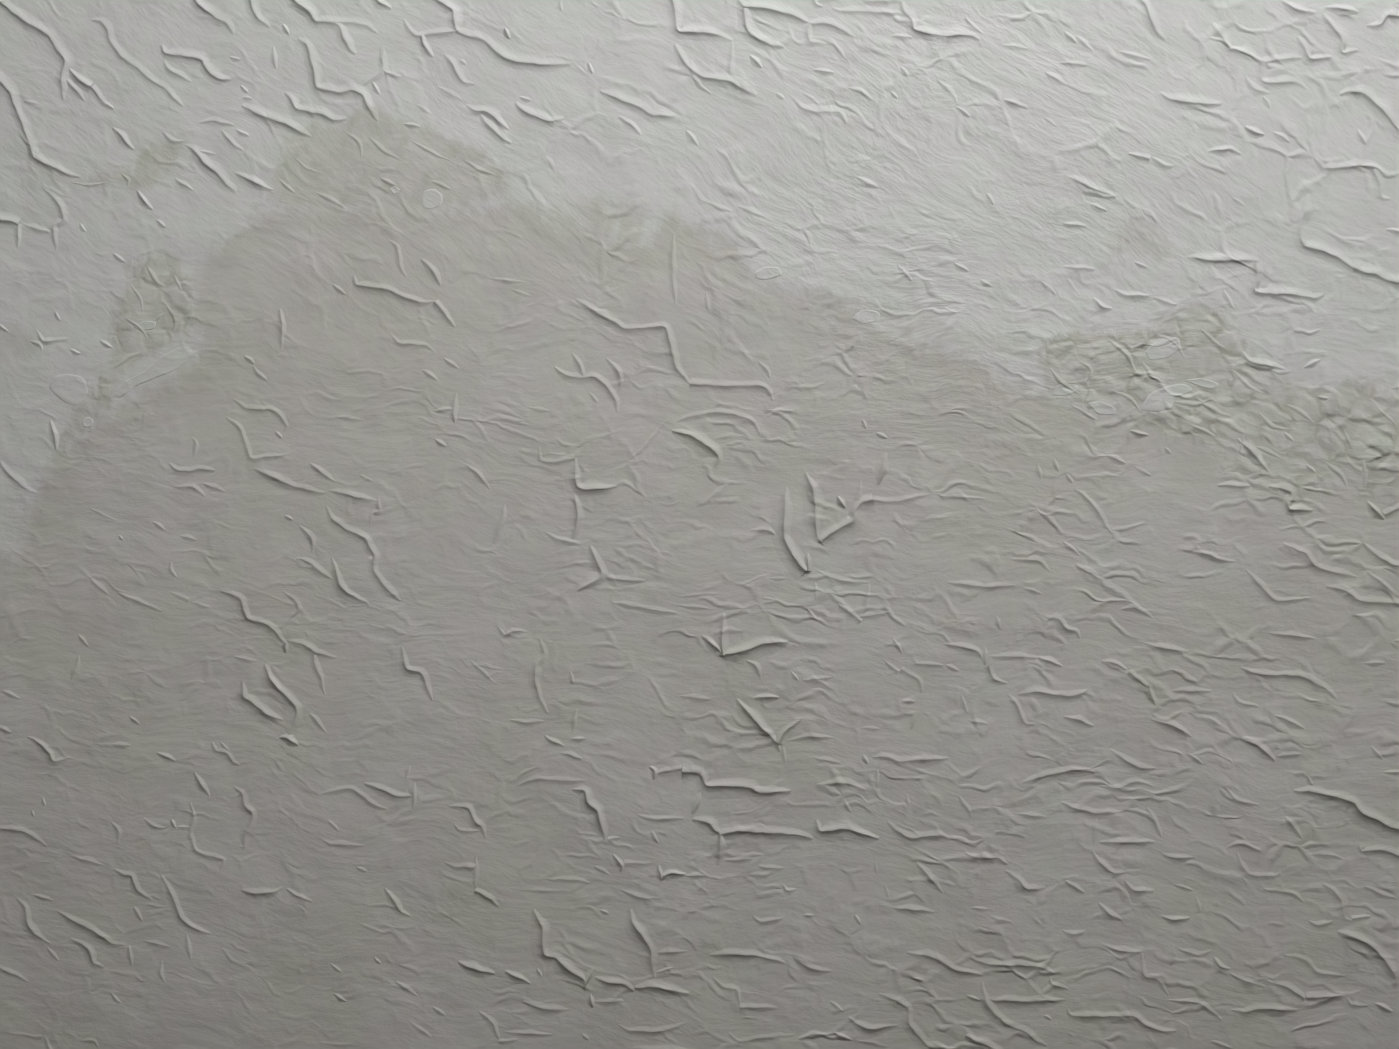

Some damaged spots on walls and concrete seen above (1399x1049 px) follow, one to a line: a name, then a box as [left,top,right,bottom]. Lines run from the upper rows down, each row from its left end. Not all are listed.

water stain [13,139,89,202]
water stain [514,177,619,268]
water stain [601,184,731,269]
water stain [696,216,770,299]
water stain [792,275,879,352]
water stain [825,286,1037,379]
peeling [1020,288,1399,520]